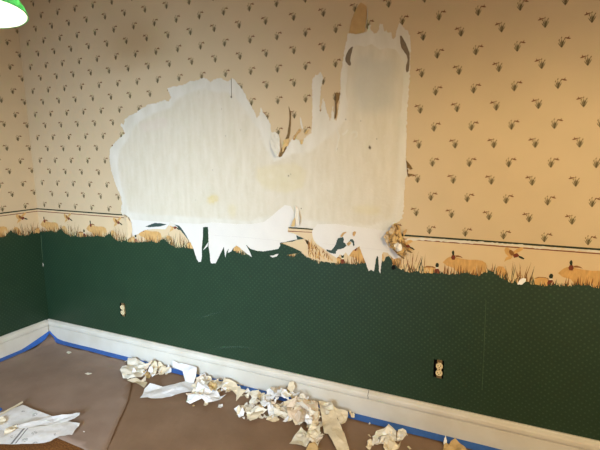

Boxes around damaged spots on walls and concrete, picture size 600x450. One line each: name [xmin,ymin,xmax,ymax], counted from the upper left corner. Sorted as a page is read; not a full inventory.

spalling [400,36,410,72]
flaking render [117,87,402,273]